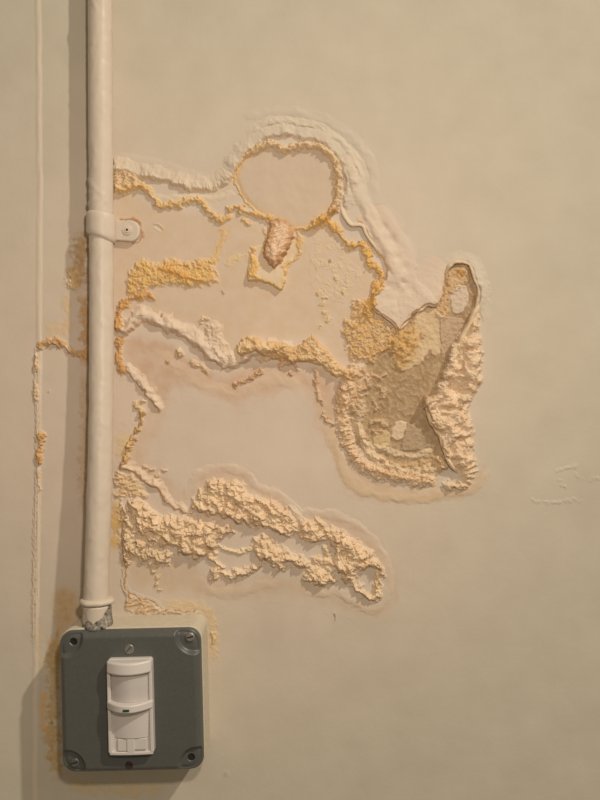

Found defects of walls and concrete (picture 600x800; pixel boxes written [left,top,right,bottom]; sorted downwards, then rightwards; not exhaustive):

leakage [31,214,89,527]
leakage [50,583,81,624]
peeling [112,362,395,616]
peeling [245,217,317,291]
leakage [113,192,498,632]
peeling [310,250,493,505]